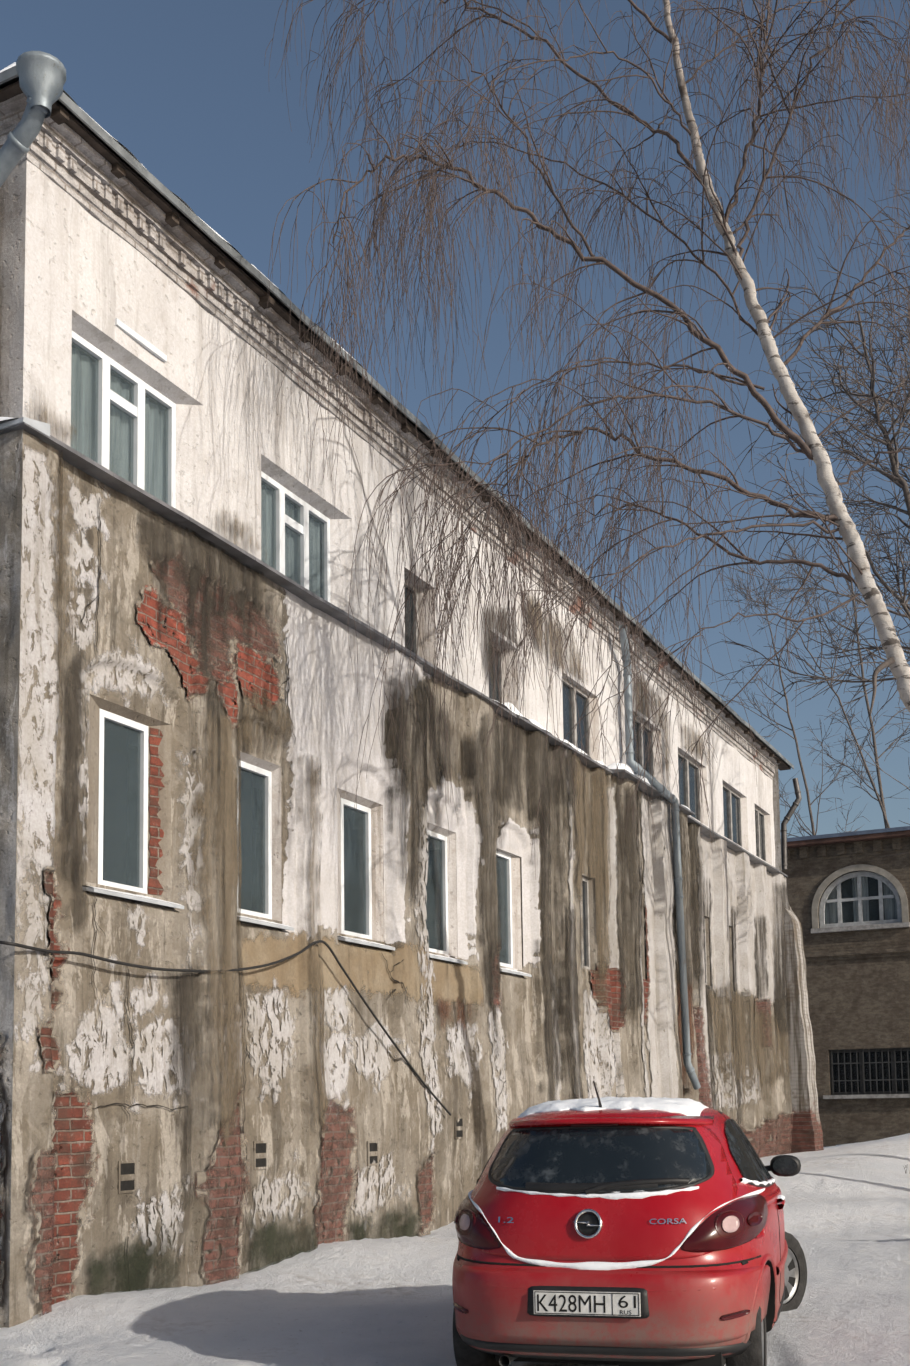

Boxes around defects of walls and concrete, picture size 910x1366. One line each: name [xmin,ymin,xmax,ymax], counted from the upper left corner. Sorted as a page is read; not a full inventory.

damp [56,459,83,926]
damp [140,511,294,1163]
peeling [0,447,542,1317]
damp [384,671,643,1100]
peeling [551,748,679,1100]
damp [636,675,710,790]
damp [671,814,790,1127]
peeling [693,826,794,1158]
damp [88,1243,177,1295]
damp [250,1221,318,1272]